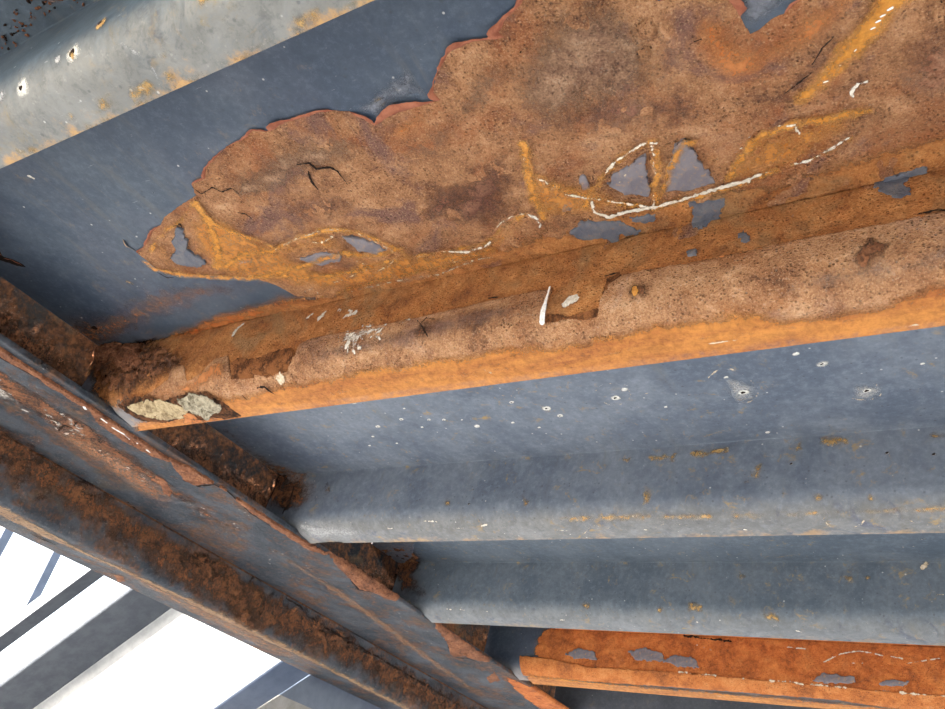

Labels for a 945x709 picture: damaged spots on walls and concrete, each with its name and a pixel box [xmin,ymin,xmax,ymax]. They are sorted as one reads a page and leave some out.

rust [1,0,84,50]
rust [72,0,945,408]
rust [0,308,75,371]
rust [137,286,945,431]
rust [0,372,213,518]
rust [0,428,481,709]
rust [507,675,892,709]
rust [535,628,945,695]